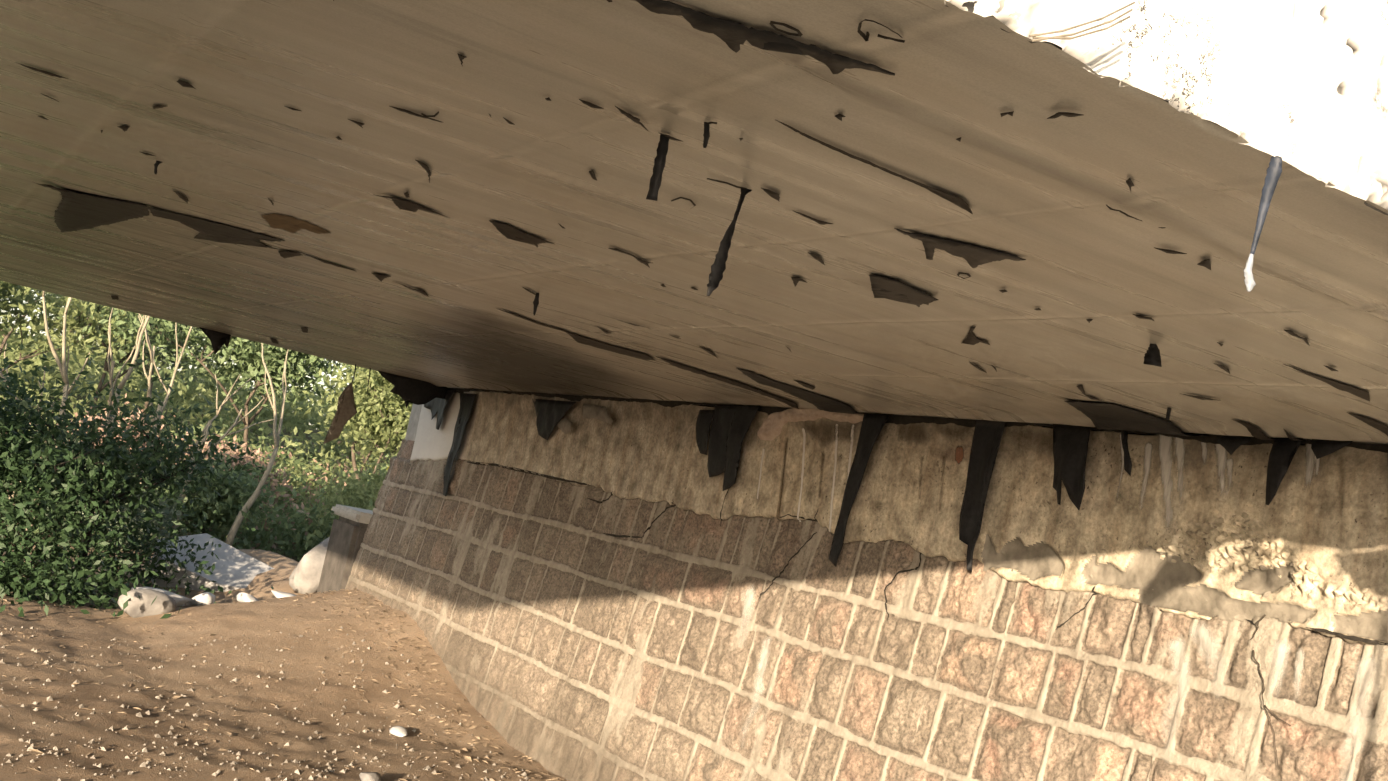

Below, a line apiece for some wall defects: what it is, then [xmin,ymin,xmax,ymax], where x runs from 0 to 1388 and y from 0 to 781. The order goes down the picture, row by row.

damp [1141,432,1184,525]
damp [1201,442,1233,488]
damp [1306,439,1320,483]
crack [759,471,818,598]
spalling [981,534,1064,581]
spalling [1081,512,1388,643]
crack [1306,627,1388,645]